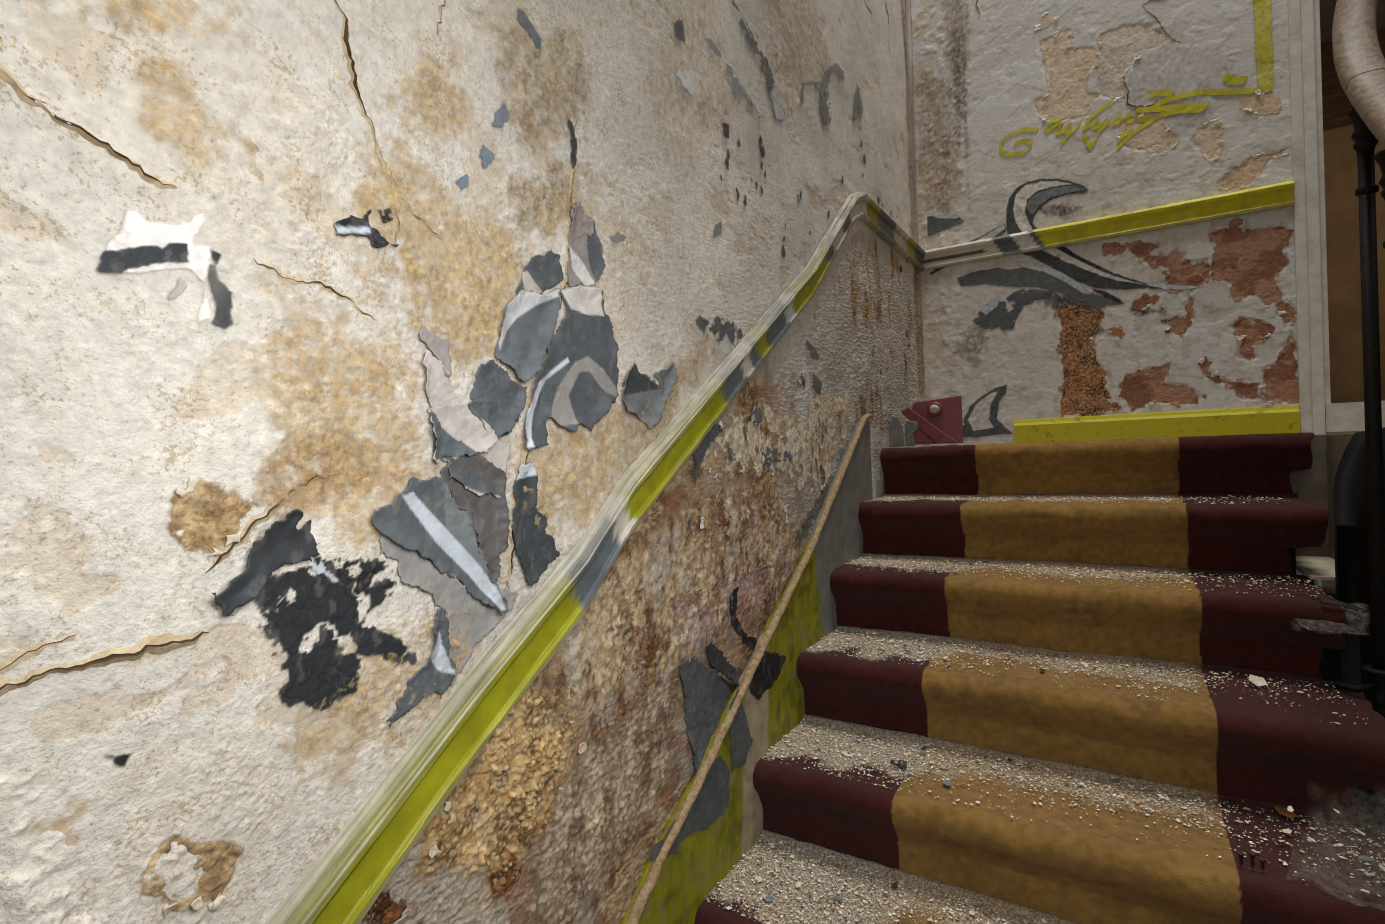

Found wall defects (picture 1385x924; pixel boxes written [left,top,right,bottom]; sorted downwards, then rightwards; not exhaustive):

crack [0,36,177,189]
crack [333,0,441,244]
peeling [98,209,233,329]
leakage [359,162,577,358]
flaking render [1055,218,1299,417]
leakage [258,319,419,544]
peeling [169,201,678,728]
crack [0,630,209,697]
flaking render [412,340,851,924]
flaking render [141,835,244,919]
rust [362,890,422,924]
rust [489,850,522,899]